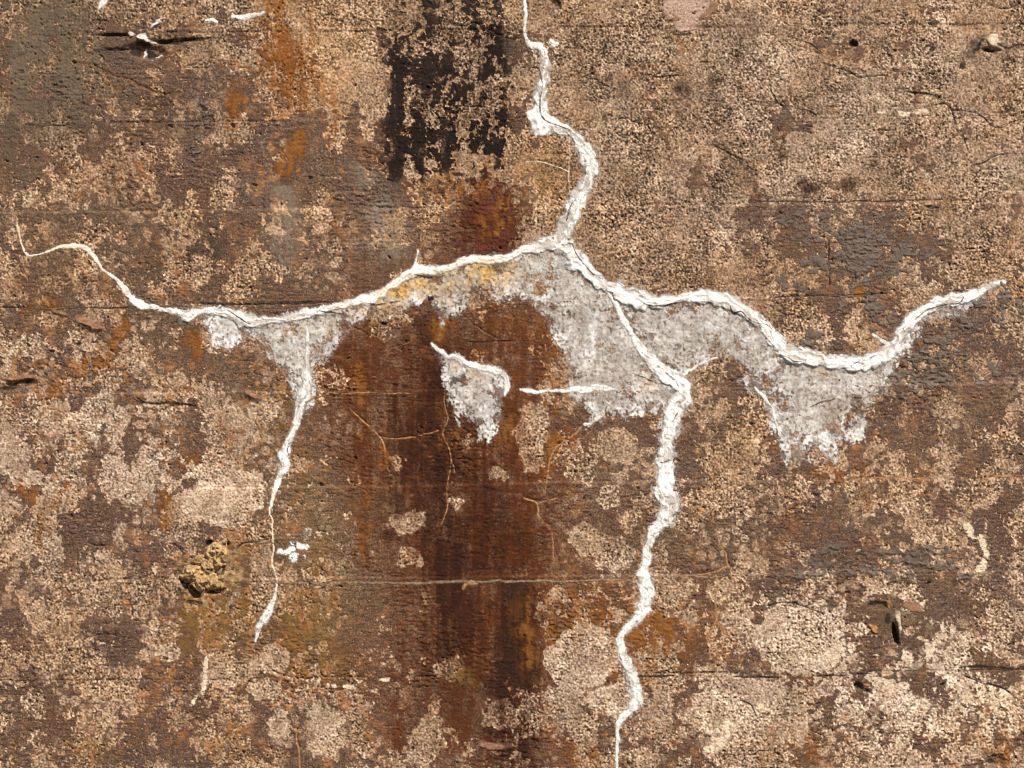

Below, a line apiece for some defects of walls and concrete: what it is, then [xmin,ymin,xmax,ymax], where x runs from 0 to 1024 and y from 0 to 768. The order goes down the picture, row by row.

crack [793,37,1016,166]
crack [16,0,599,329]
rust [446,183,514,254]
crack [764,199,971,209]
crack [467,315,513,342]
water stain [203,251,980,466]
crack [135,399,197,407]
crack [310,392,582,559]
crack [554,238,1006,768]
rust [611,605,675,650]
crack [959,665,1024,700]
crack [294,721,302,768]